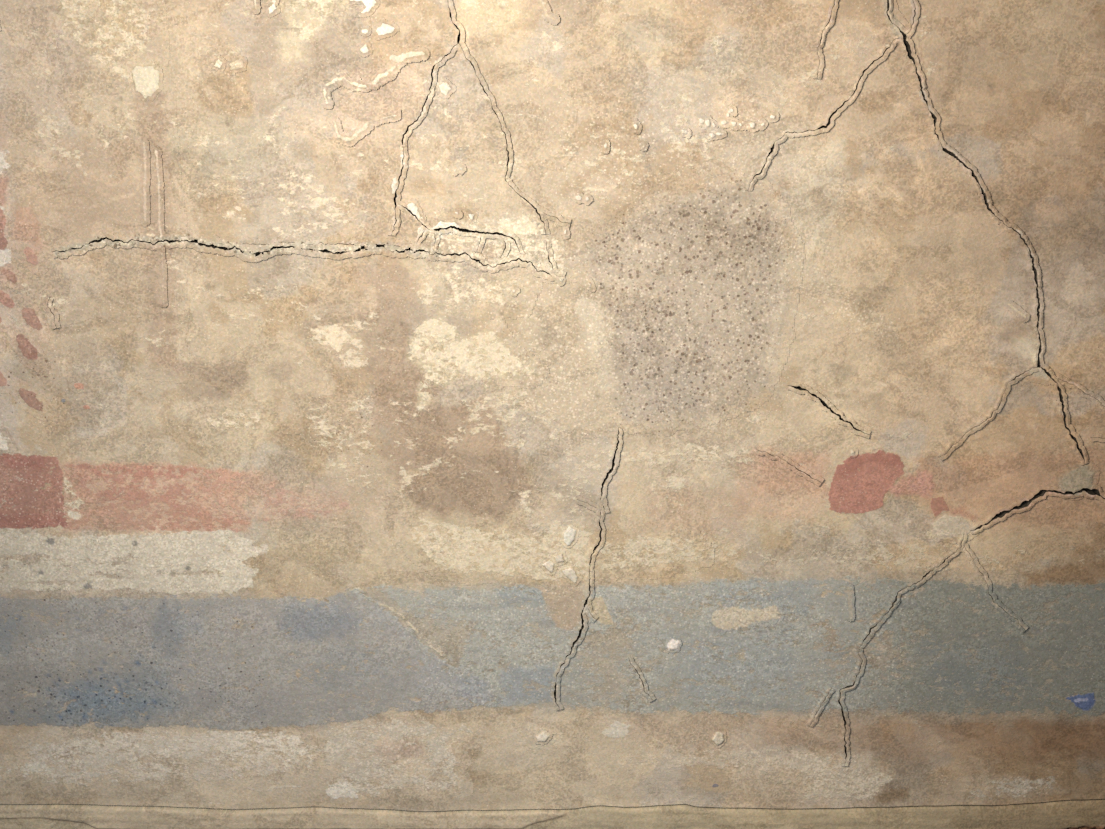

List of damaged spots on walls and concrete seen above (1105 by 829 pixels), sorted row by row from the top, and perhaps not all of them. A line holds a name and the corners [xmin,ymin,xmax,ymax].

crack [50,0,572,283]
crack [745,0,1105,766]
crack [550,428,623,711]